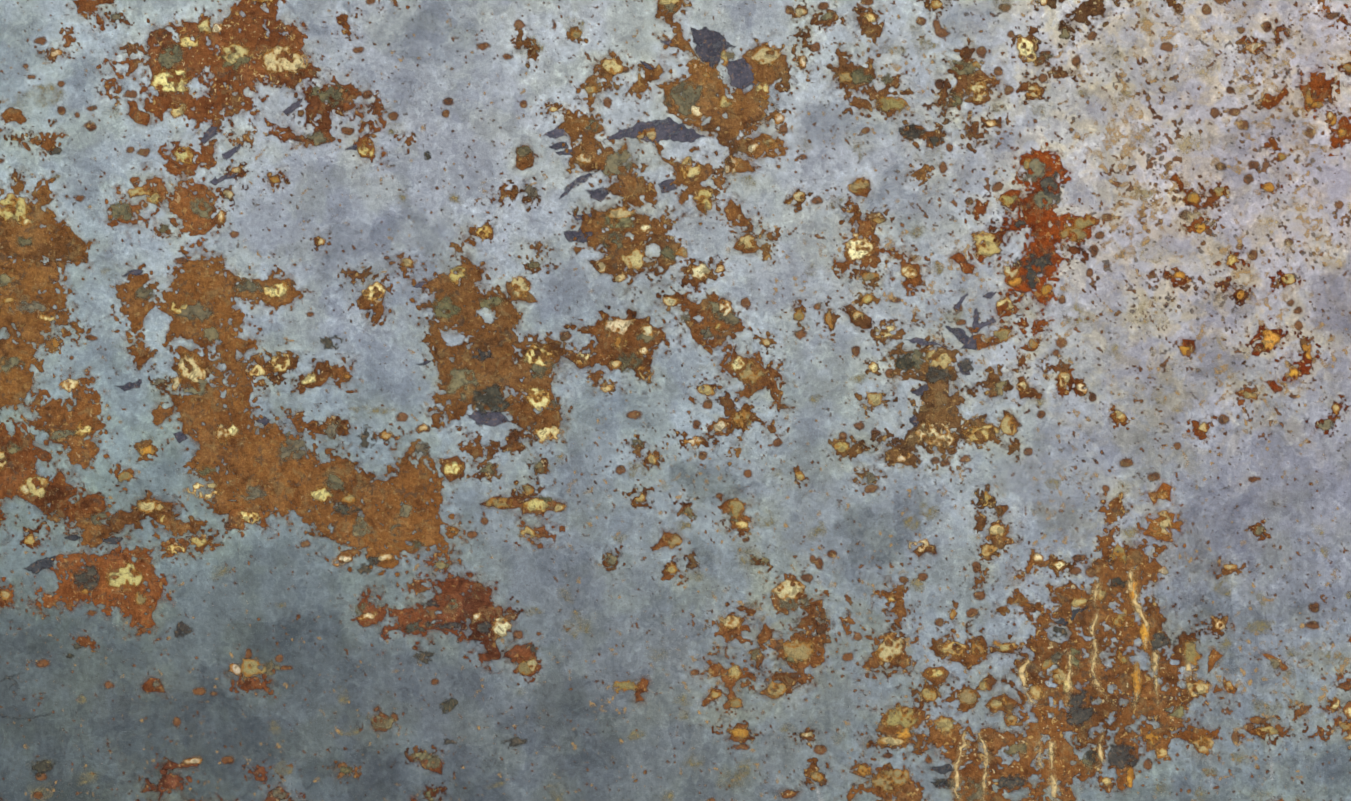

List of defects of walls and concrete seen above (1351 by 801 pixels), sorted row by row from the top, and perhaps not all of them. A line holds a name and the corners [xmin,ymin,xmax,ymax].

corrosion [323,0,420,61]
corrosion [913,0,960,38]
corrosion [1199,0,1231,15]
corrosion [431,86,468,132]
corrosion [310,228,331,265]
corrosion [1317,201,1351,247]
corrosion [1300,543,1348,638]
corrosion [193,618,306,706]
corrosion [138,678,166,698]
corrosion [303,713,362,784]
corrosion [781,721,839,799]